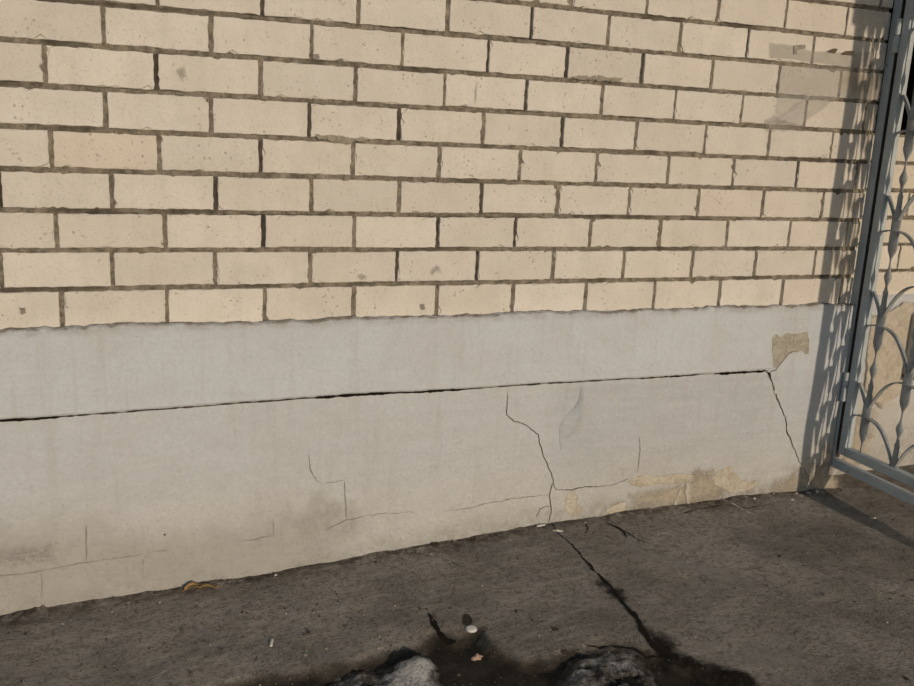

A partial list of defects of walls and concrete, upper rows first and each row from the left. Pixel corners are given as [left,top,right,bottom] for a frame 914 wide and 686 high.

peeling [770,330,811,370]
crack [0,350,811,658]
spalling [606,466,758,514]